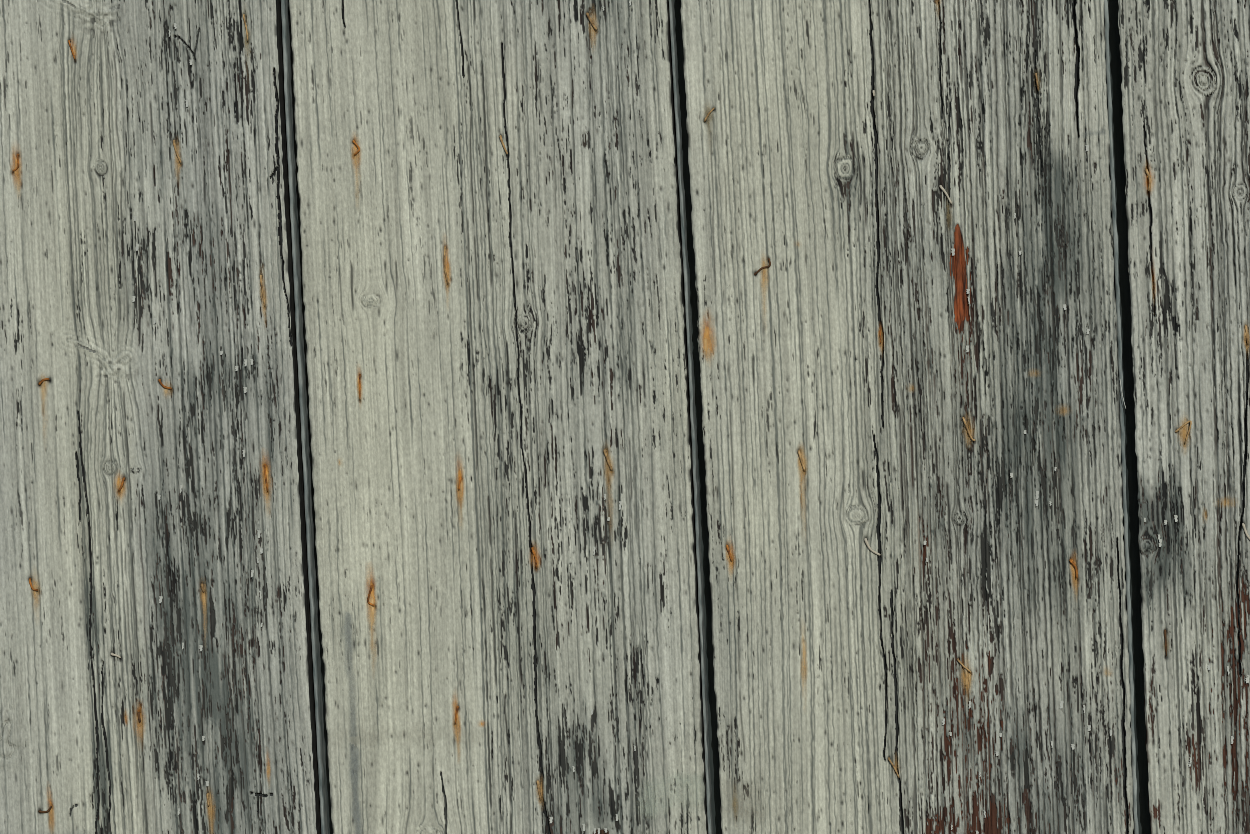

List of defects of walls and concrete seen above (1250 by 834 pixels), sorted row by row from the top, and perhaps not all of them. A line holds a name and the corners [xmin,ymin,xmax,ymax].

peeling [950,224,971,359]
peeling [993,129,1112,360]
peeling [132,341,278,834]
peeling [577,479,623,578]
peeling [964,382,1090,610]
peeling [1139,472,1188,576]
peeling [545,687,644,834]
peeling [926,644,1117,834]
peeling [1188,578,1250,814]